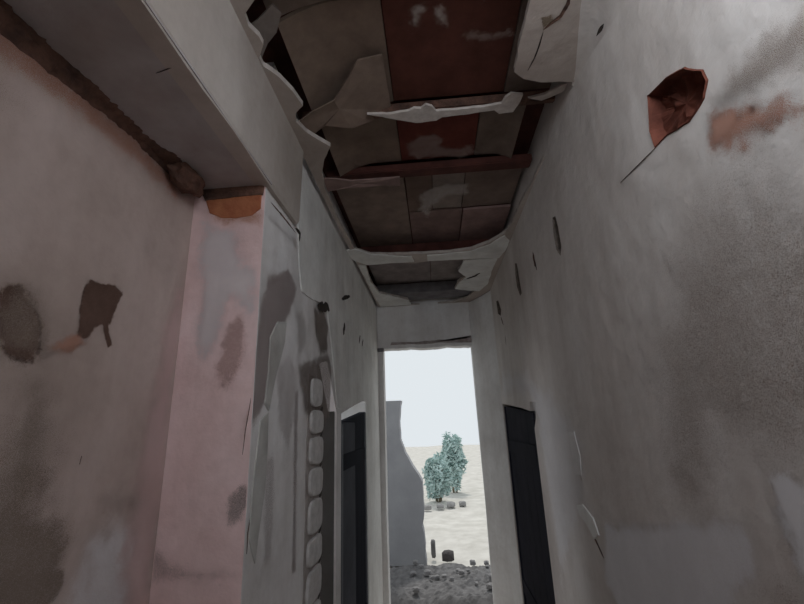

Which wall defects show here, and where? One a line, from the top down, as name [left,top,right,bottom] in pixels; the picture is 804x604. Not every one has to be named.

peeling [408,2,449,34]
spalling [0,0,182,174]
spalling [620,67,708,183]
spalling [553,217,561,256]
peeling [0,274,123,381]
damp [0,359,83,604]